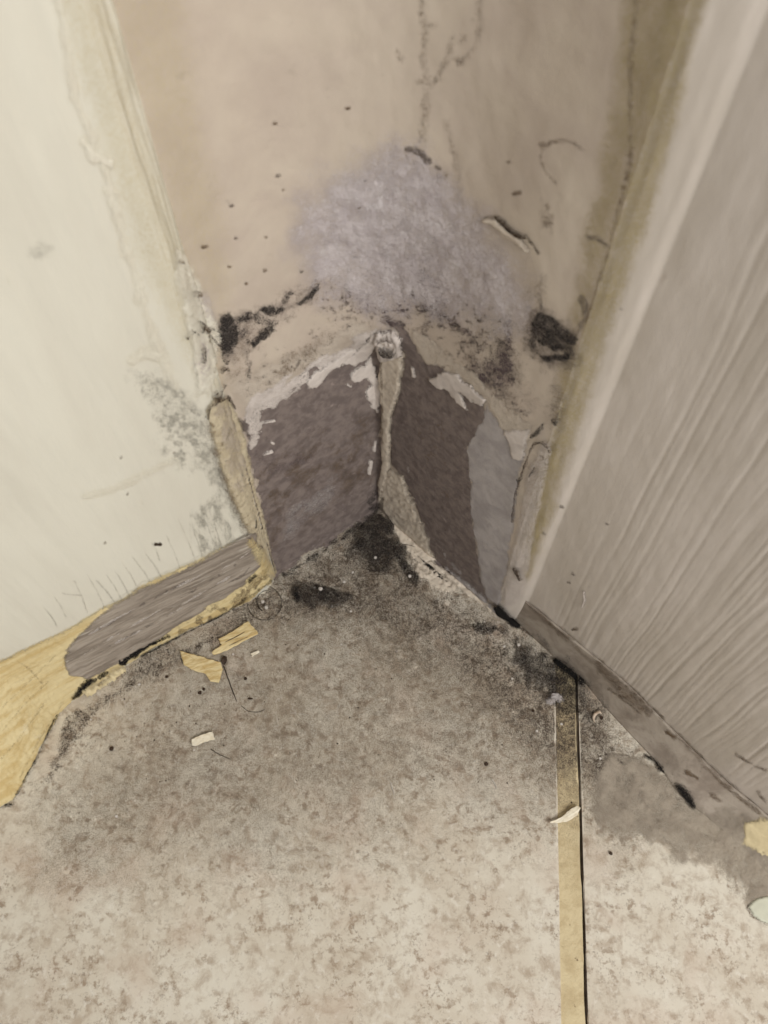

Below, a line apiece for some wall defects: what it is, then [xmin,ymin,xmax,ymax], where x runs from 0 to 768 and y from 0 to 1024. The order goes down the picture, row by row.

peeling [204,316,559,617]
leakage [215,0,710,570]